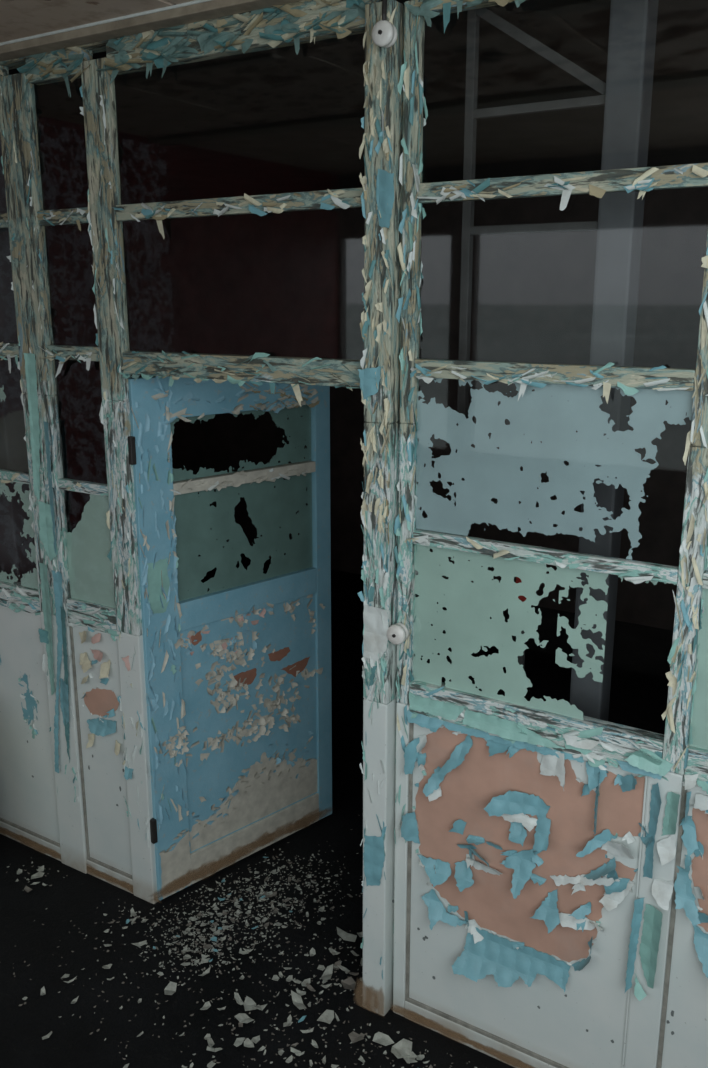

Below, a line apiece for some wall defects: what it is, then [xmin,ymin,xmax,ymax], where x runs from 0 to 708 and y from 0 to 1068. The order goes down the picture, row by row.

peeling [17,0,526,405]
peeling [544,176,606,211]
peeling [624,167,658,199]
peeling [674,165,708,178]
peeling [699,292,708,349]
peeling [0,304,325,899]
peeling [358,346,708,1001]